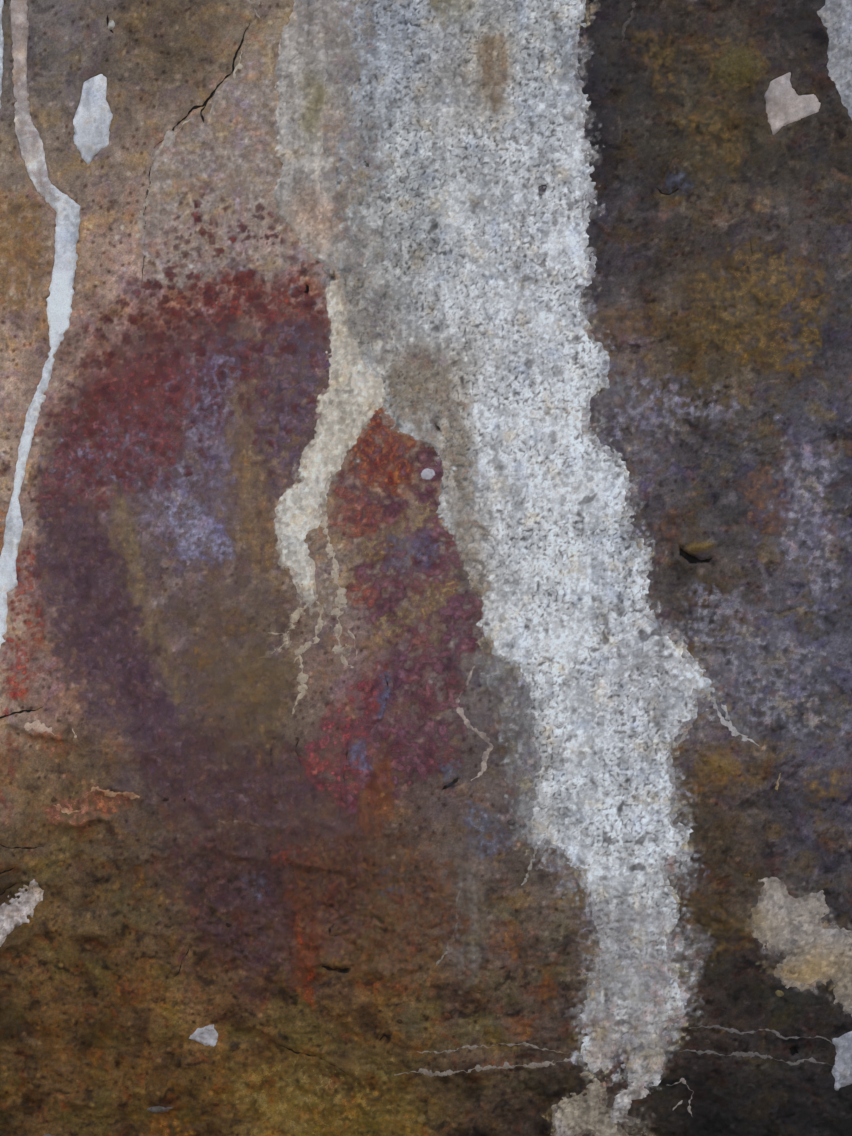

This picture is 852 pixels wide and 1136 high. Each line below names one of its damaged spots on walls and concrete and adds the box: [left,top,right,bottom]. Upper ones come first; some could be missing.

peeling [73,74,113,164]
crack [141,23,250,283]
peeling [764,72,821,135]
spalling [817,0,852,120]
corrosion [336,345,490,597]
spalling [0,879,44,947]
peeling [745,877,852,1017]
peeling [189,1024,218,1047]
spalling [832,1031,852,1091]